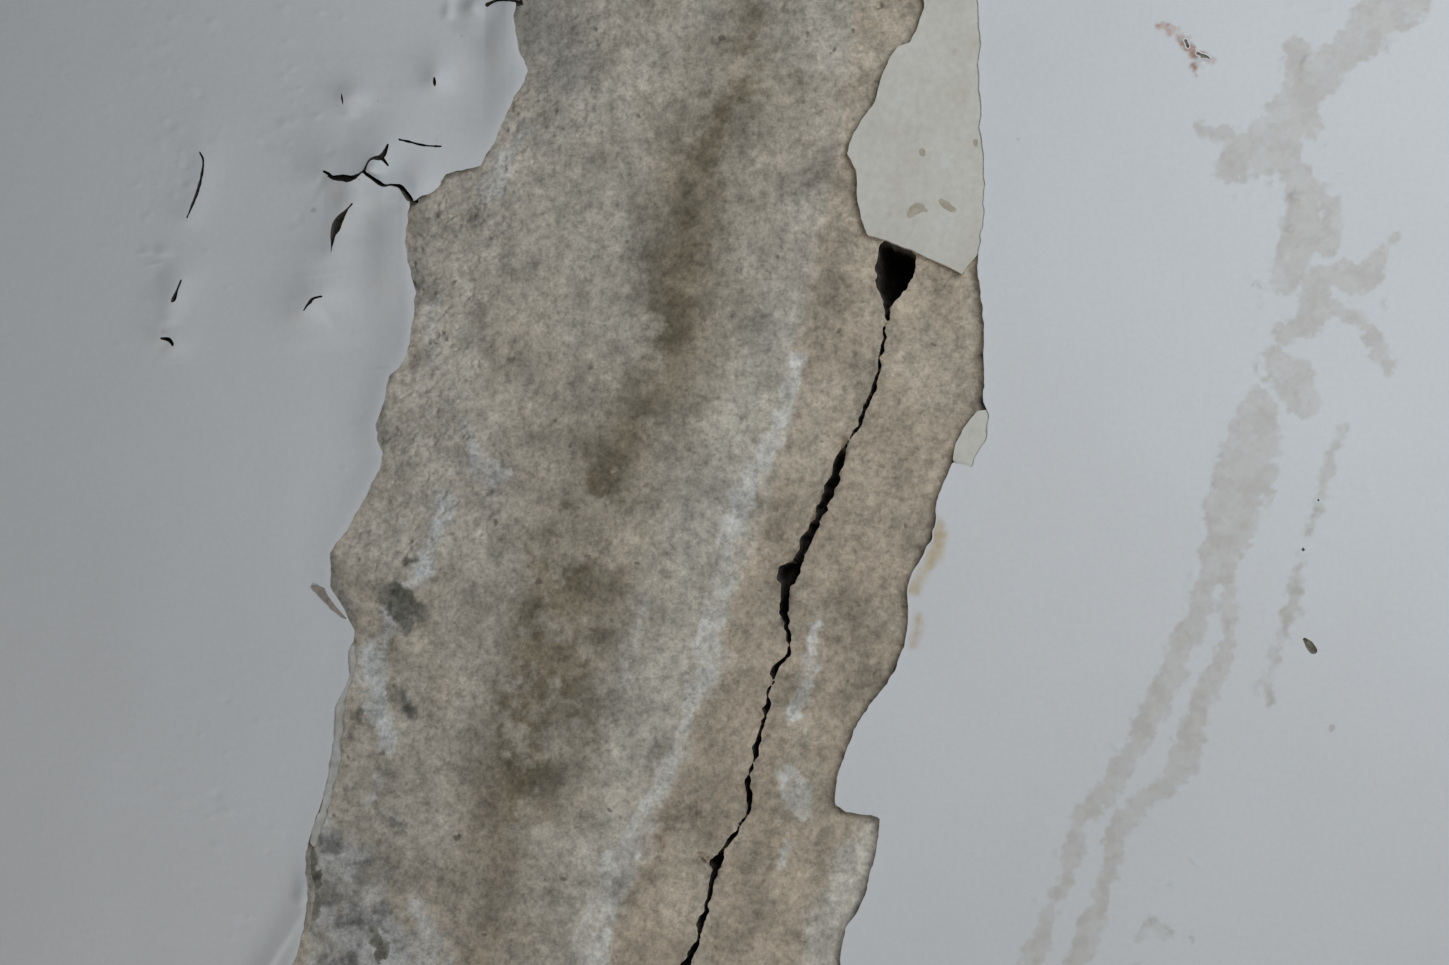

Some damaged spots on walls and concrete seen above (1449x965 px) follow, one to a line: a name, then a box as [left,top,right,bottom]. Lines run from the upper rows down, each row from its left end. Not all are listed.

peeling [260,0,703,965]
peeling [541,0,989,965]
crack [680,241,916,965]
leakage [1014,0,1434,965]